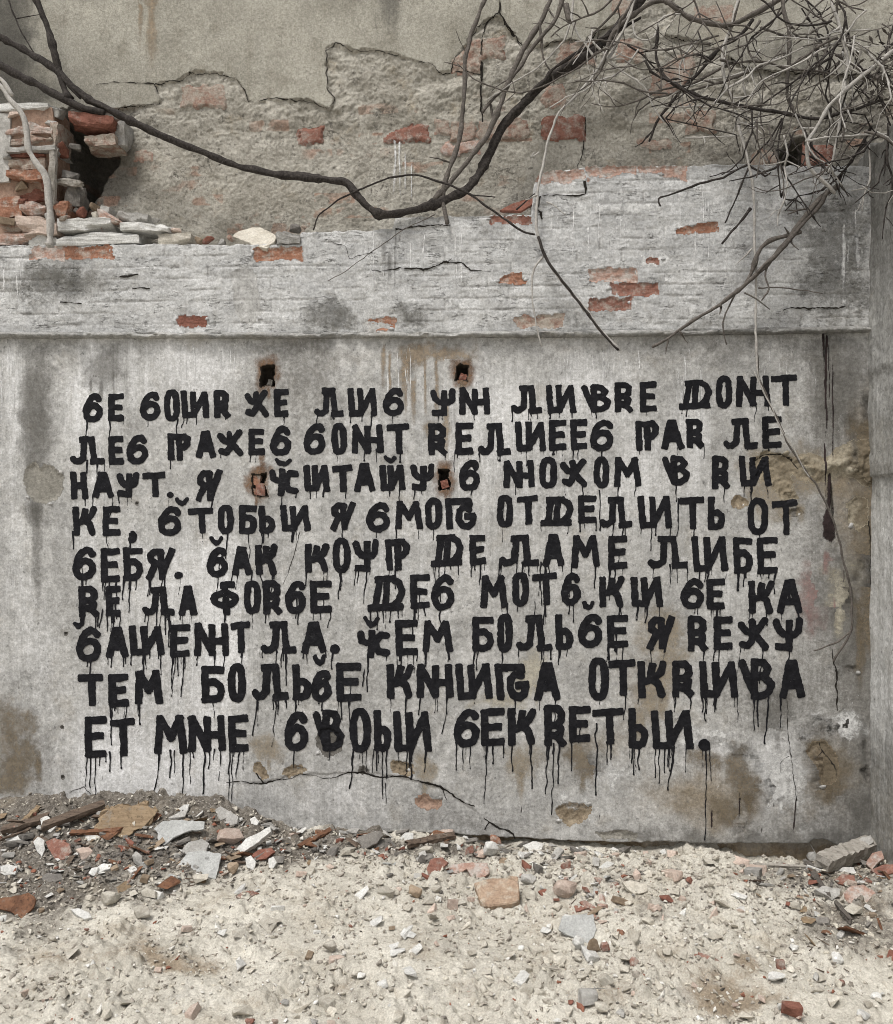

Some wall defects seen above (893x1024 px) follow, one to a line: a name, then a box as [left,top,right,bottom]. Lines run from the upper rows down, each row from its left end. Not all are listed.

spalling [60,0,893,262]